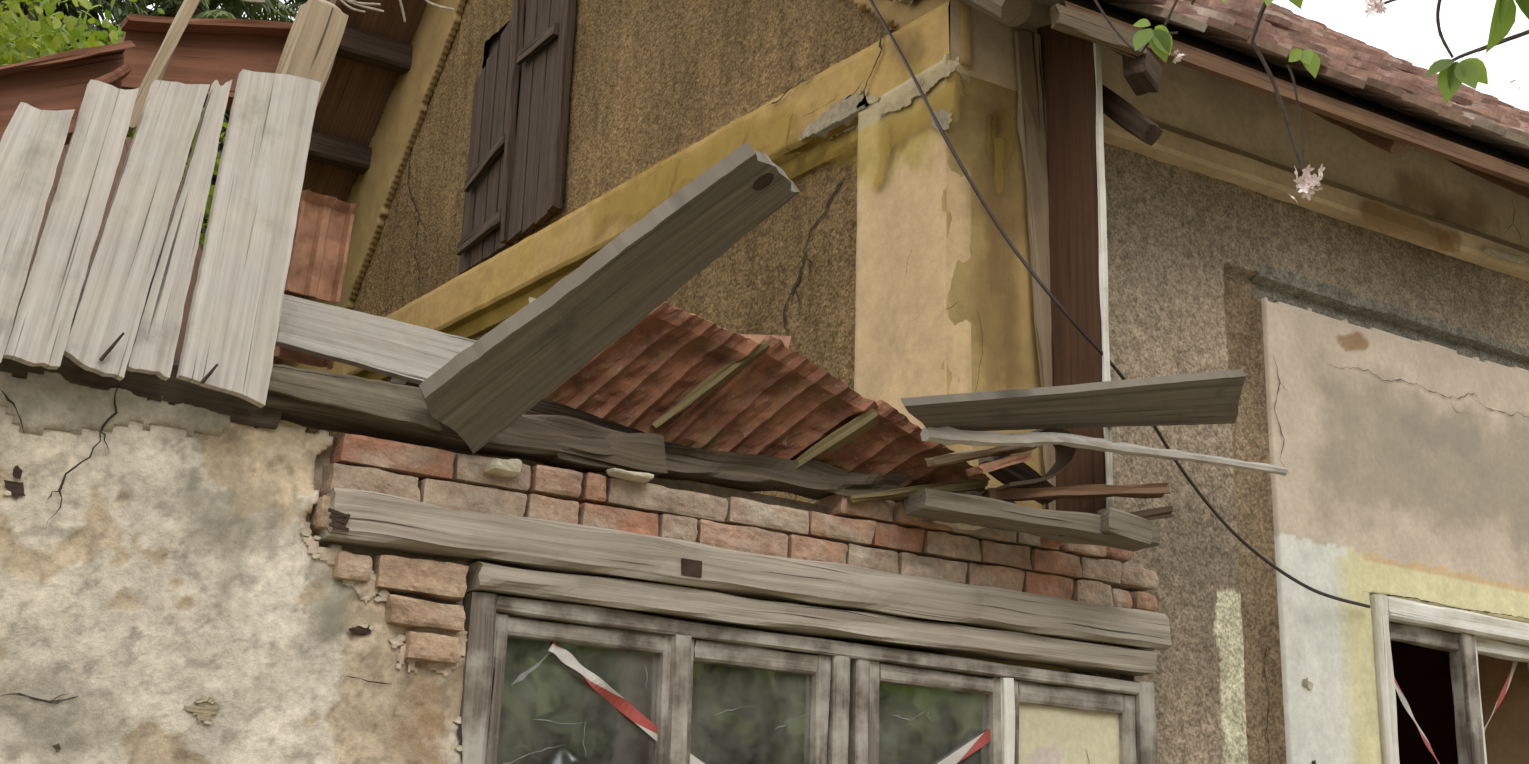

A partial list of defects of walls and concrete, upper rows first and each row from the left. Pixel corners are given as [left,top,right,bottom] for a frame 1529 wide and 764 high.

spalling [798,56,961,141]
crack [783,169,849,332]
crack [1333,366,1529,418]
crack [46,382,121,526]
spalling [3,465,26,499]
spalling [300,527,337,564]
spalling [342,570,390,603]
spalling [349,622,375,635]
spalling [388,628,468,676]
spalling [183,695,219,724]
spalling [454,693,464,762]